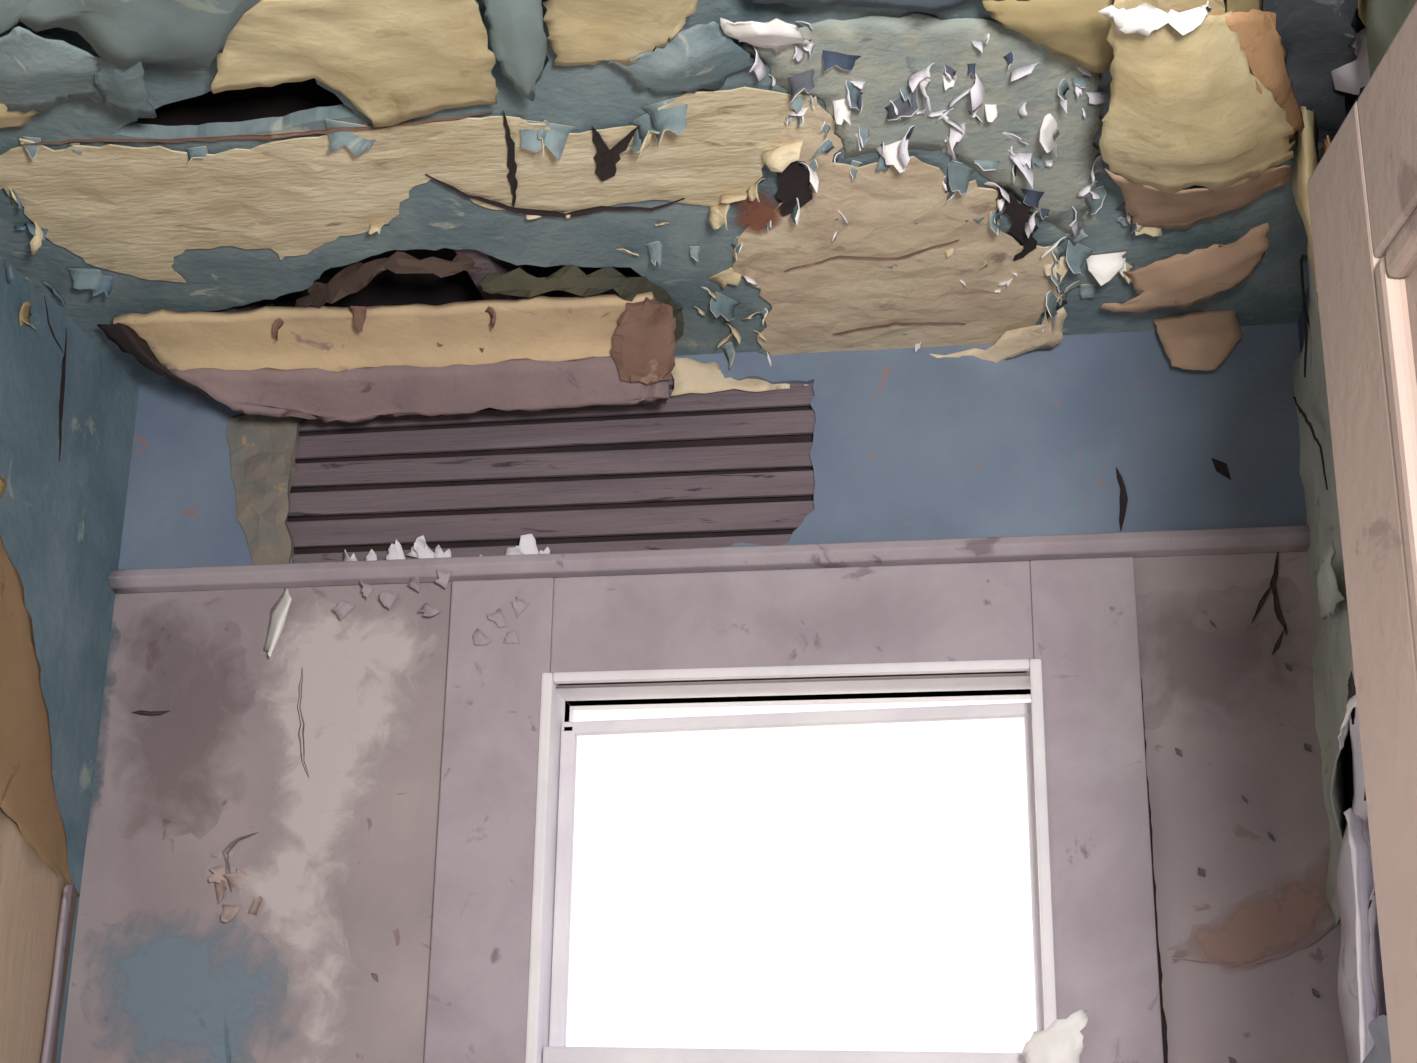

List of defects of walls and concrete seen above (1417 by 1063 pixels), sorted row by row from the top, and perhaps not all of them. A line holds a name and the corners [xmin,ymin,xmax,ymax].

peeling [1263,0,1370,162]
flaking render [0,0,1162,370]
crack [1251,552,1287,655]